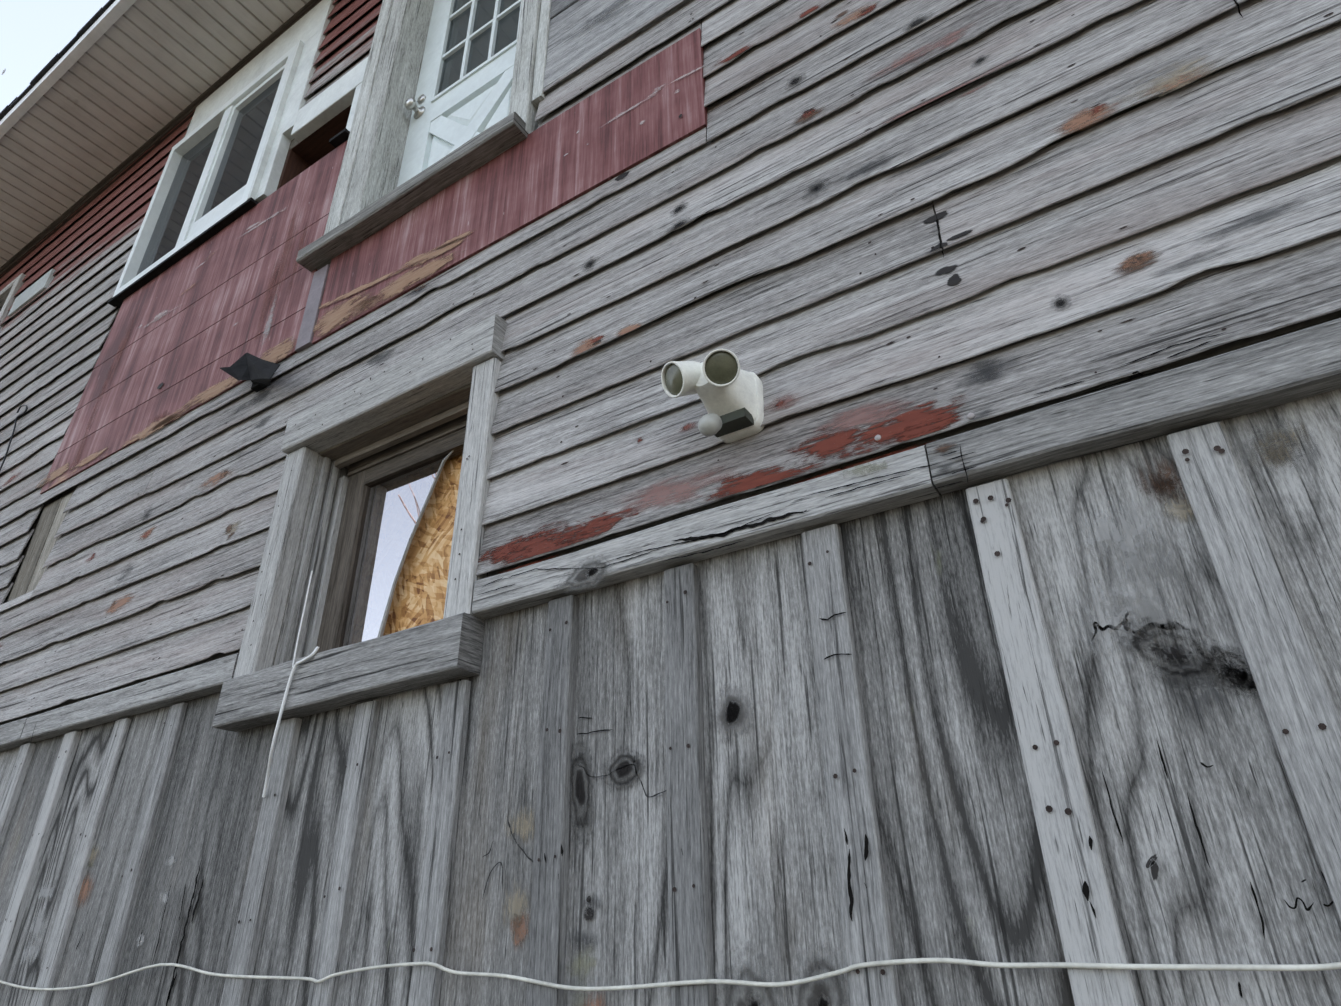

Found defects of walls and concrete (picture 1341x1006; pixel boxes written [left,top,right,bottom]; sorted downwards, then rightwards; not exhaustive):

peeling [318,231,470,310]
peeling [261,337,295,363]
peeling [153,376,238,430]
peeling [706,395,963,501]
peeling [477,508,639,574]
crack [478,447,976,595]
crack [1092,613,1235,661]